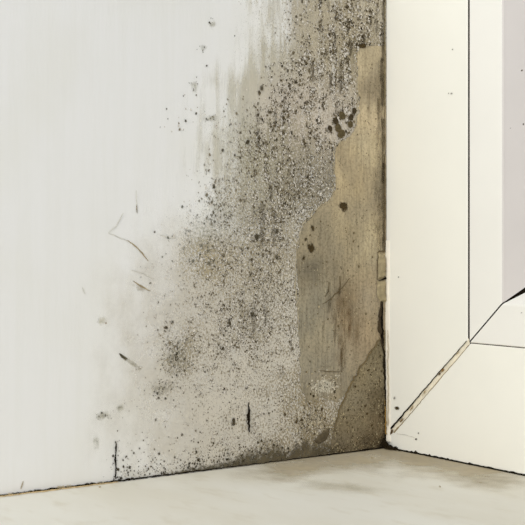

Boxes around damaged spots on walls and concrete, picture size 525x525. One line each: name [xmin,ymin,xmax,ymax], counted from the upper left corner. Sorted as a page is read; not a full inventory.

crack [0,421,386,497]
crack [232,402,250,432]
leakage [112,0,502,480]
peeling [294,45,386,456]
crack [378,301,386,406]
crack [381,0,389,251]